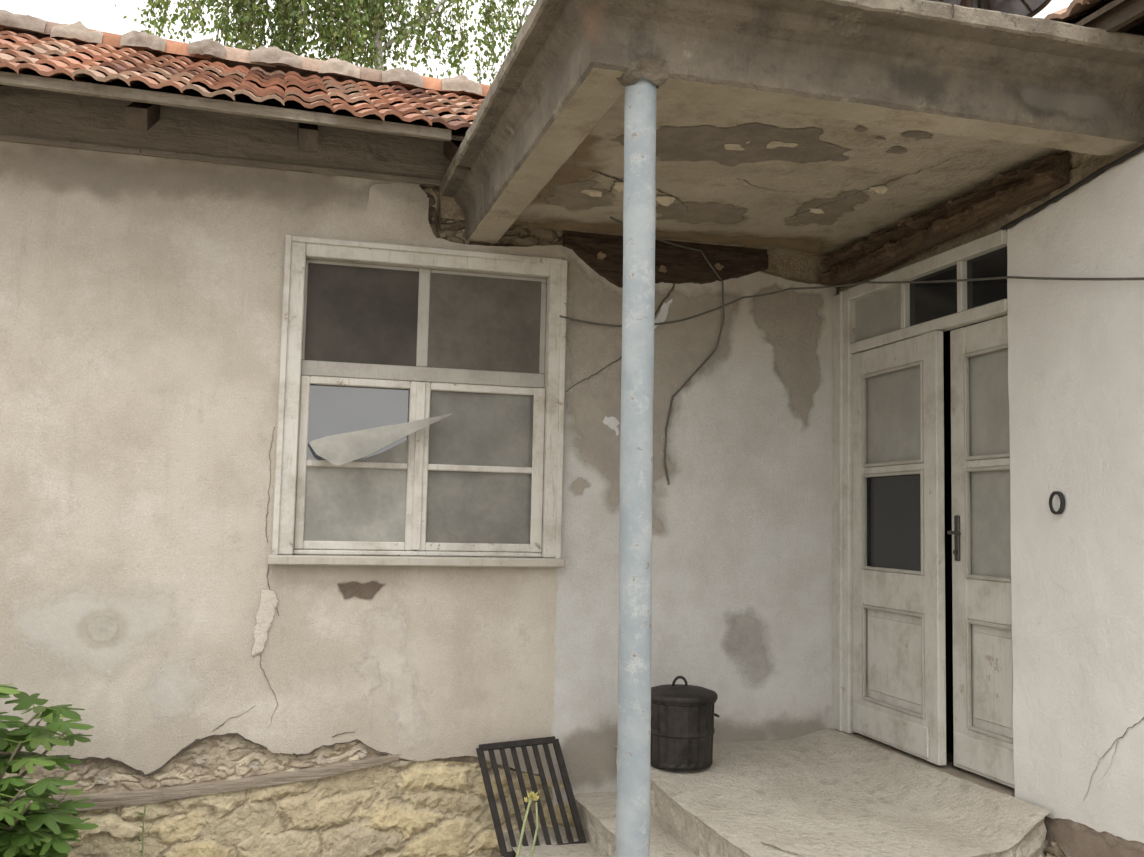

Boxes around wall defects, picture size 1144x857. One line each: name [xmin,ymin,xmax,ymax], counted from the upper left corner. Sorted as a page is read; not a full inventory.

peeling [656,123,852,166]
peeling [656,202,746,224]
peeling [420,181,623,504]
peeling [652,239,768,493]
crack [0,427,392,776]
spalling [0,735,381,797]
crack [1083,717,1144,801]
flaking render [1045,816,1144,857]